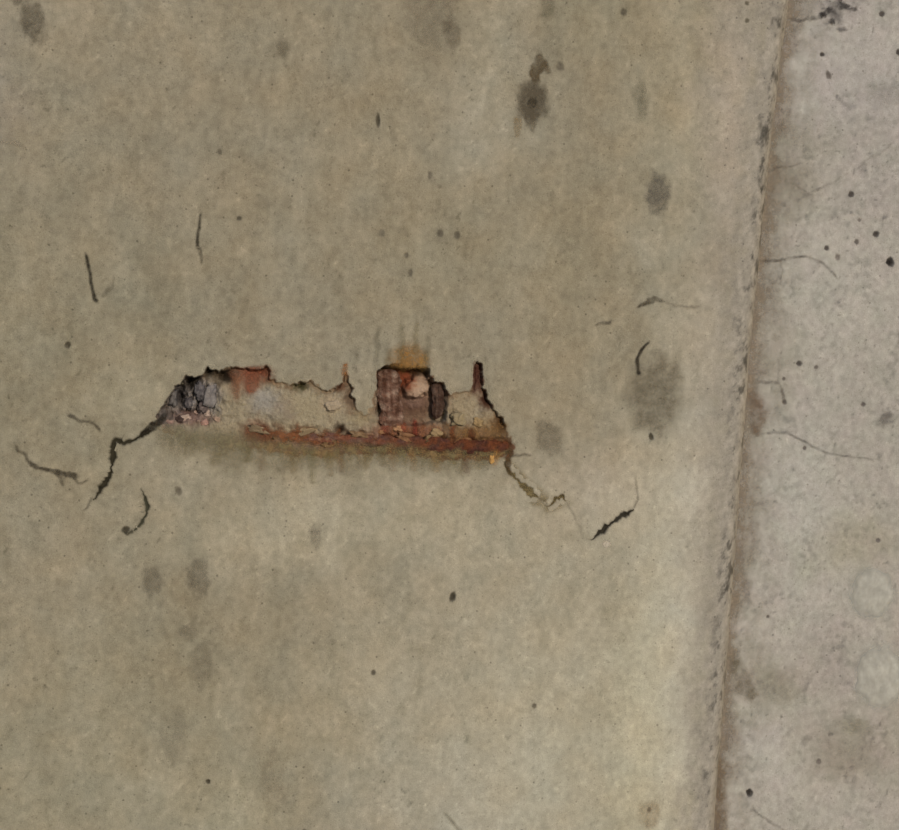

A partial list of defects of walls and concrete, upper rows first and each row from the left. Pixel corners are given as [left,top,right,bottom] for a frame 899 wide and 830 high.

water stain [516,55,547,123]
corrosion [397,347,425,367]
corrosion [246,425,347,449]
spalling [146,355,519,466]
crack [17,413,167,536]
crack [497,450,571,512]
crack [586,503,637,545]